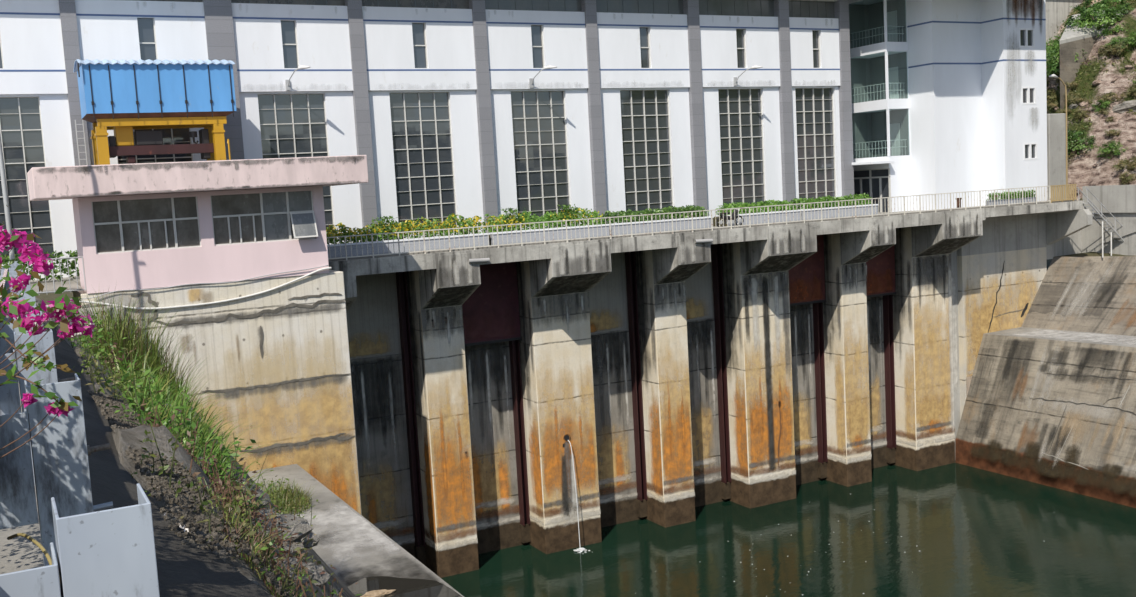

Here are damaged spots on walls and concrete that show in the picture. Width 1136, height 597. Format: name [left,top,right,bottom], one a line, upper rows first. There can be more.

crack [988,261,1029,332]
rust [424,419,510,536]
rust [530,411,628,505]
damp [193,215,1136,557]
rust [651,401,711,494]
rust [736,384,810,473]
crack [1031,369,1136,453]